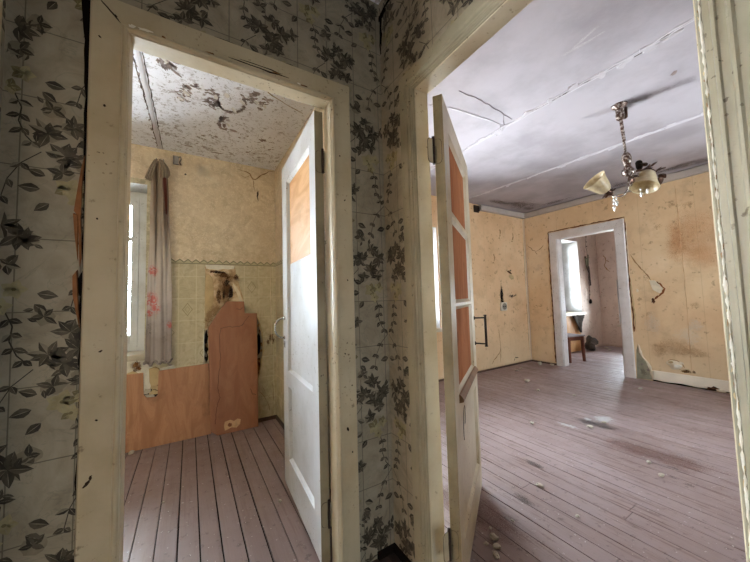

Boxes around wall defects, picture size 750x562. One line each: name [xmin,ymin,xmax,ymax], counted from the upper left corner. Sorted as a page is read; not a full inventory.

crack [430,17,695,153]
crack [239,169,272,199]
flaking render [204,265,243,333]
crack [492,217,665,364]